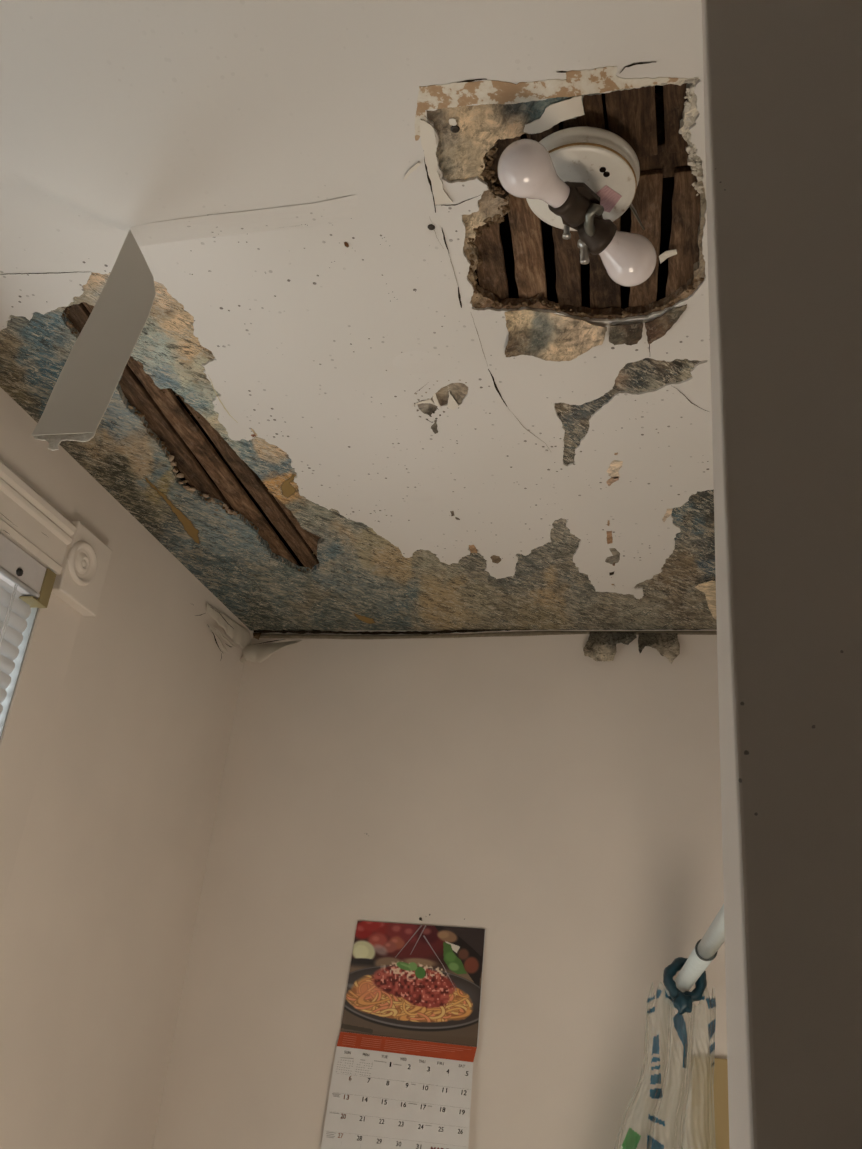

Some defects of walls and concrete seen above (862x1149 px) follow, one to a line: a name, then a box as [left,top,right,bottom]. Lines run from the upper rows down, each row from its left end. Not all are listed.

peeling [0,272,111,423]
water stain [145,478,200,544]
water stain [281,474,296,498]
peeling [59,281,717,664]
crack [424,157,551,452]
spalling [415,66,707,362]